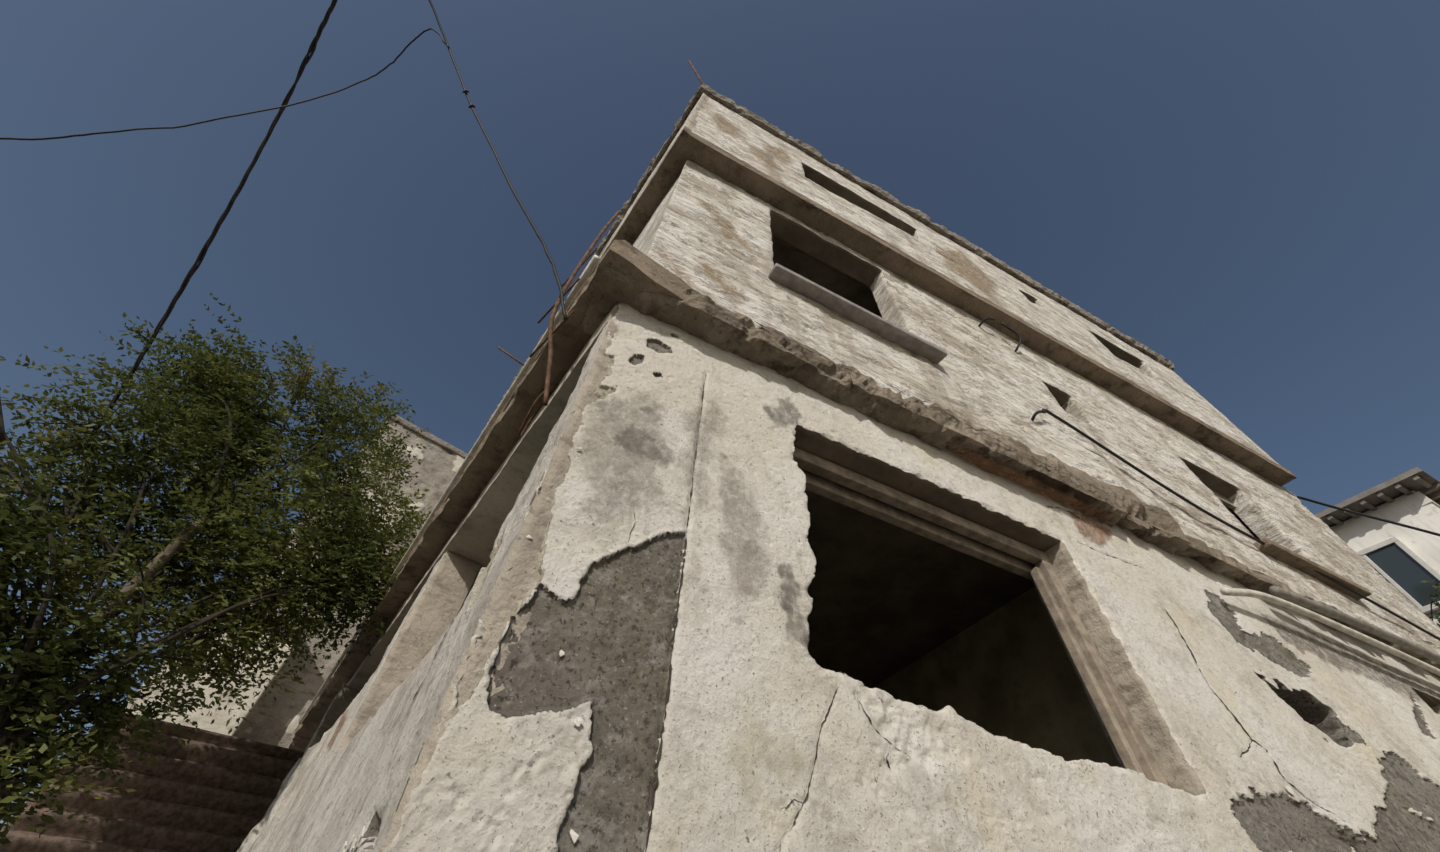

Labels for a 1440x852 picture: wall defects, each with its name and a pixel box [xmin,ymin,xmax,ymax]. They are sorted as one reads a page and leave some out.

peeling [681,167,779,227]
peeling [882,272,995,364]
peeling [574,333,678,414]
peeling [456,433,685,852]
peeling [1205,589,1311,677]
crack [1165,609,1344,821]
peeling [1410,694,1436,739]
crack [780,687,908,844]
peeling [1230,726,1440,852]